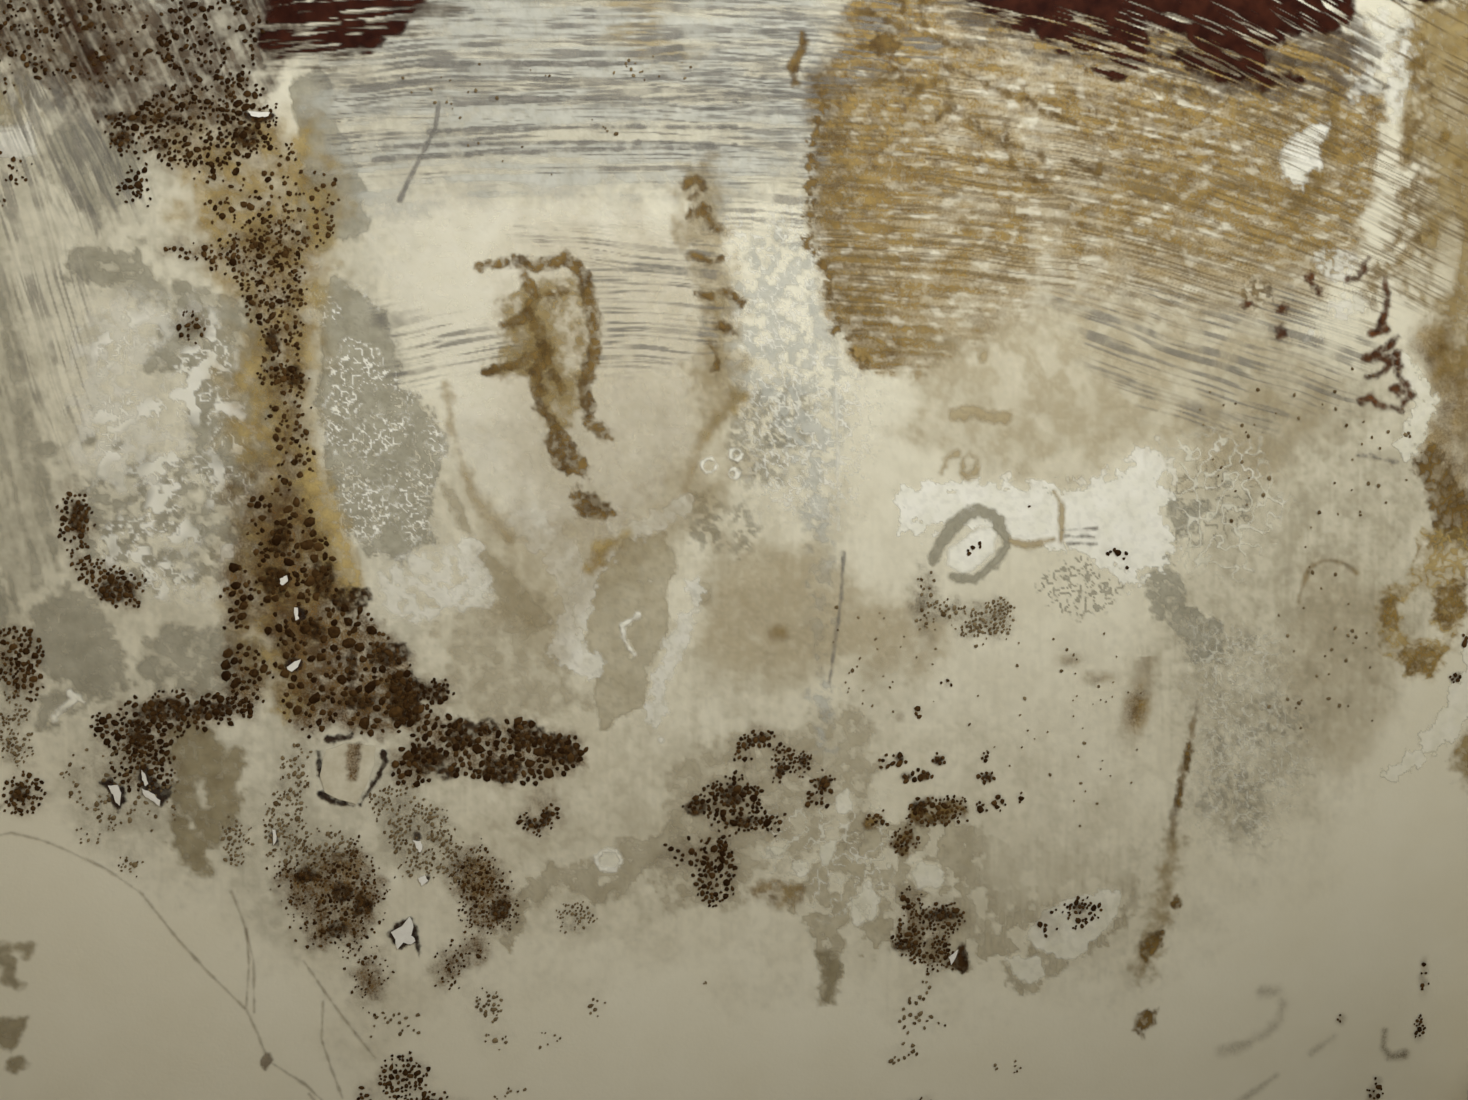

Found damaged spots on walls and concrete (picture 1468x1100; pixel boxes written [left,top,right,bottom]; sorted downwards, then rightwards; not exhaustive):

water stain [806,0,1468,518]
corrosion [475,252,616,519]
corrosion [1358,280,1416,413]
water stain [0,0,588,1100]
water stain [900,492,1064,665]
corrosion [1379,443,1468,677]
water stain [663,729,836,908]
water stain [863,746,1024,856]
corrosion [1175,724,1193,807]
spalling [389,917,420,952]
corrosion [1141,866,1181,969]
crack [261,1054,273,1069]